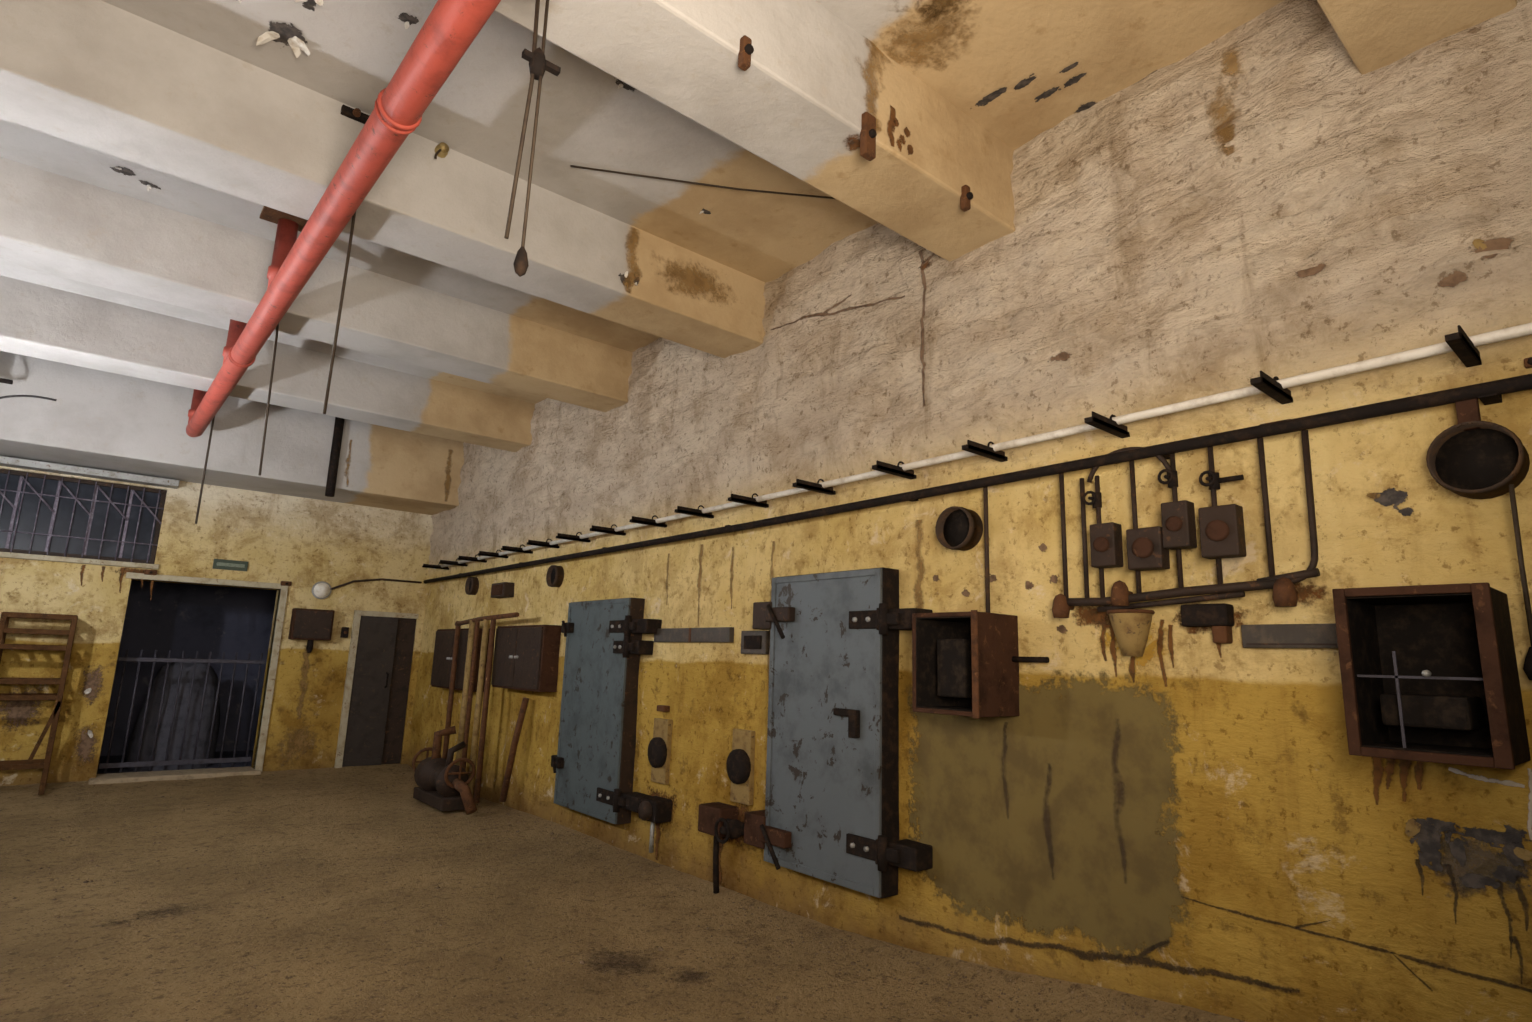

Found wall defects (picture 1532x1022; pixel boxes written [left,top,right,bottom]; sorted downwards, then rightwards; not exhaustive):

peeling [256,21,310,58]
peeling [295,0,324,11]
water stain [844,0,967,151]
corrosion [1372,757,1424,805]
crack [899,915,1300,993]
crack [1181,896,1532,993]